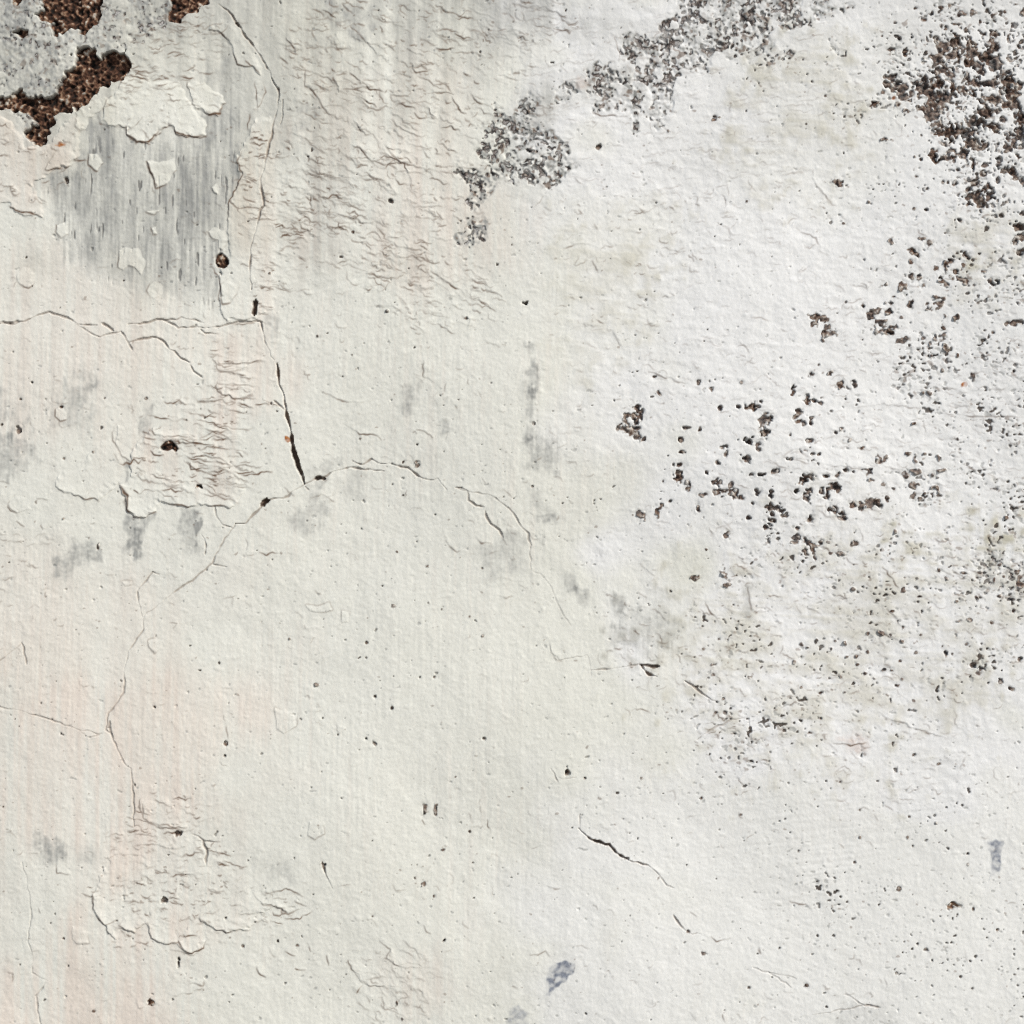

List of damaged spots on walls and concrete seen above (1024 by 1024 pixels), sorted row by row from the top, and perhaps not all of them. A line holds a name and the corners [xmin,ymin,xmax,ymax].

peeling [0,0,856,323]
flaking render [870,3,1024,256]
crack [0,3,572,828]
flaking render [616,405,646,443]
flaking render [632,500,672,524]
flaking render [663,385,947,563]
flaking render [808,370,858,390]
flaking render [861,237,1000,382]
flaking render [970,662,1015,691]
crack [578,813,676,889]